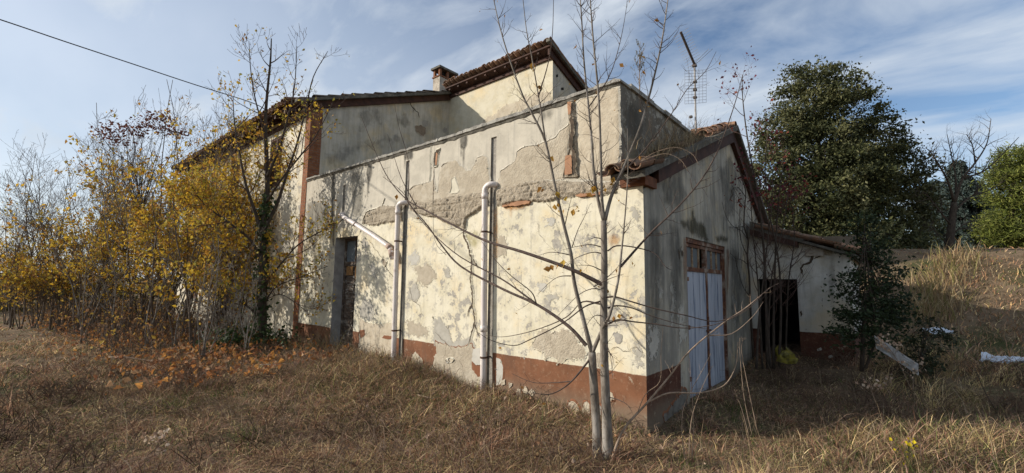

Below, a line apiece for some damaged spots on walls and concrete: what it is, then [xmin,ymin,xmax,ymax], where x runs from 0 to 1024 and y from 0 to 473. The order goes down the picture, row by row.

spalling [363,86,622,230]
leakage [681,211,728,241]
peeling [406,250,452,302]
peeling [343,277,480,389]
peeling [520,307,600,367]